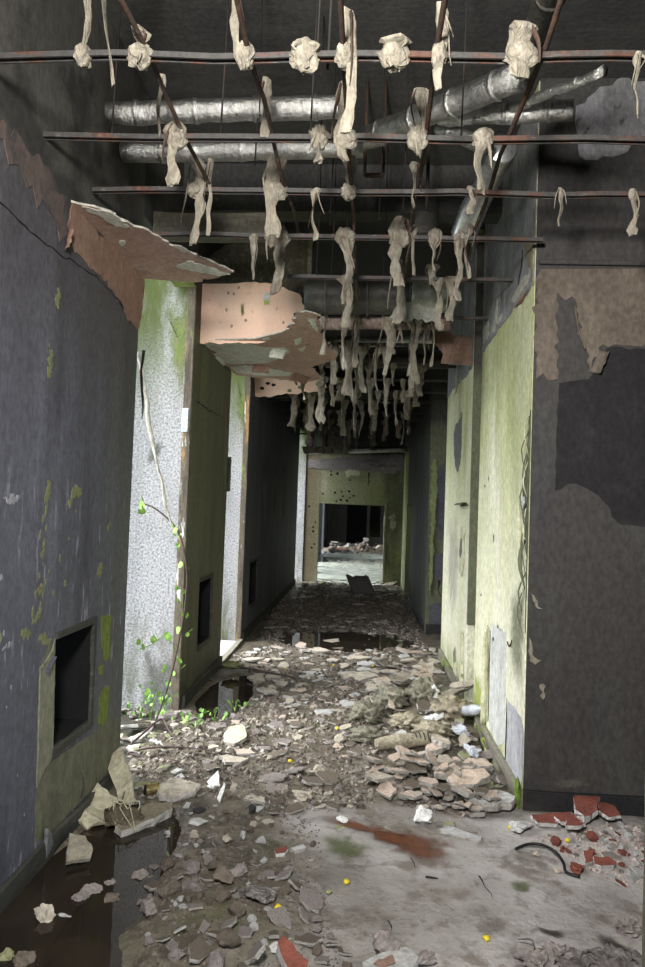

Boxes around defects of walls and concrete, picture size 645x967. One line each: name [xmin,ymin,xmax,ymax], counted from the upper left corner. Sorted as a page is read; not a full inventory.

crack [0,202,131,325]
peeling [0,120,145,329]
peeling [174,245,231,276]
peeling [205,338,310,384]
flaking render [429,123,539,591]
peeling [555,346,645,527]